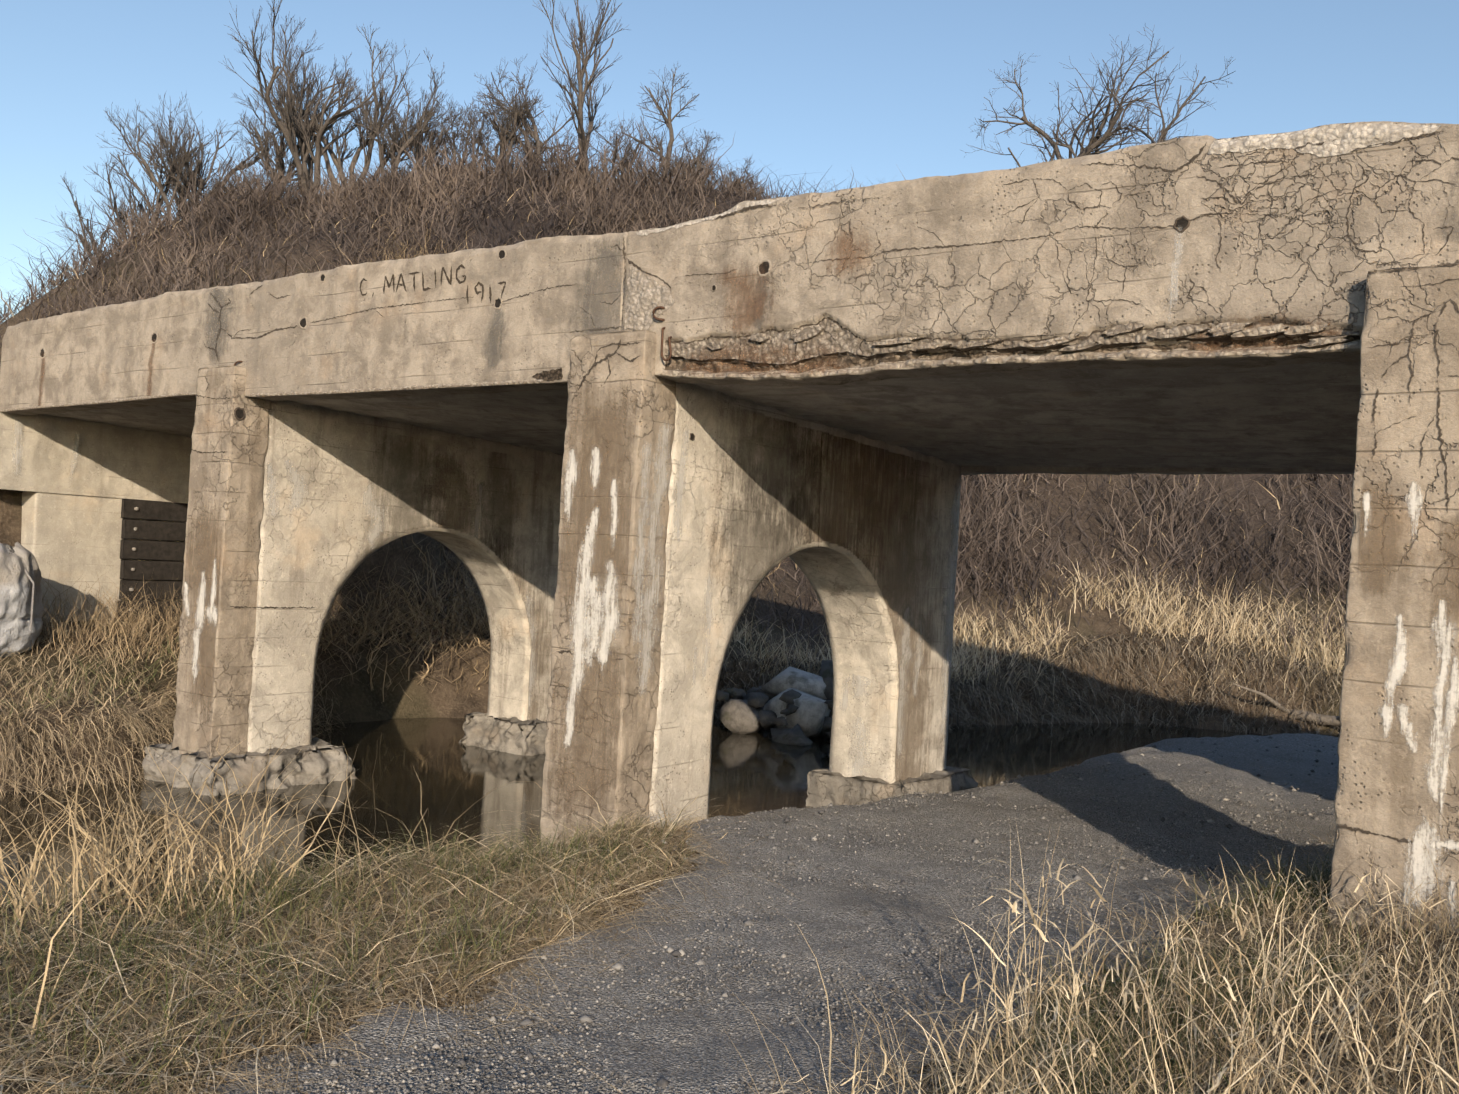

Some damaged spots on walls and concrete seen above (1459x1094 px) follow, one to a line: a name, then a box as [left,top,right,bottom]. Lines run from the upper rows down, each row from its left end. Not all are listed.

crack [194,239,732,400]
spalling [624,266,675,330]
spalling [662,317,1360,378]
crack [714,131,1459,512]
water stain [184,560,217,678]
water stain [564,425,689,746]
crack [1337,824,1447,849]
water stain [1381,600,1459,919]